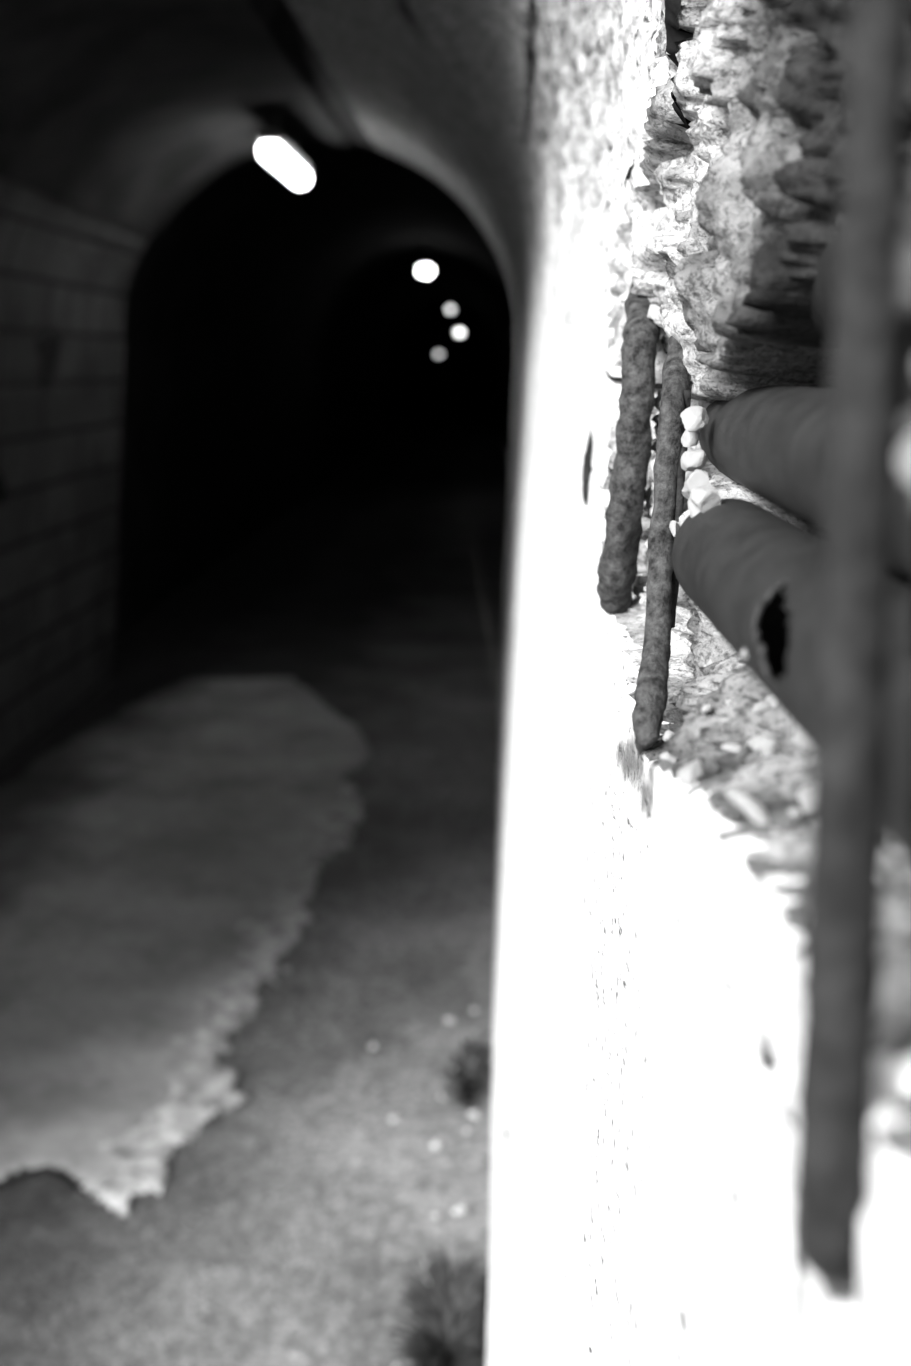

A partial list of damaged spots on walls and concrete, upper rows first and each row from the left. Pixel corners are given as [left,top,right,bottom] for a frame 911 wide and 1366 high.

spalling [581,0,911,1284]
corrosion [822,1276,860,1305]